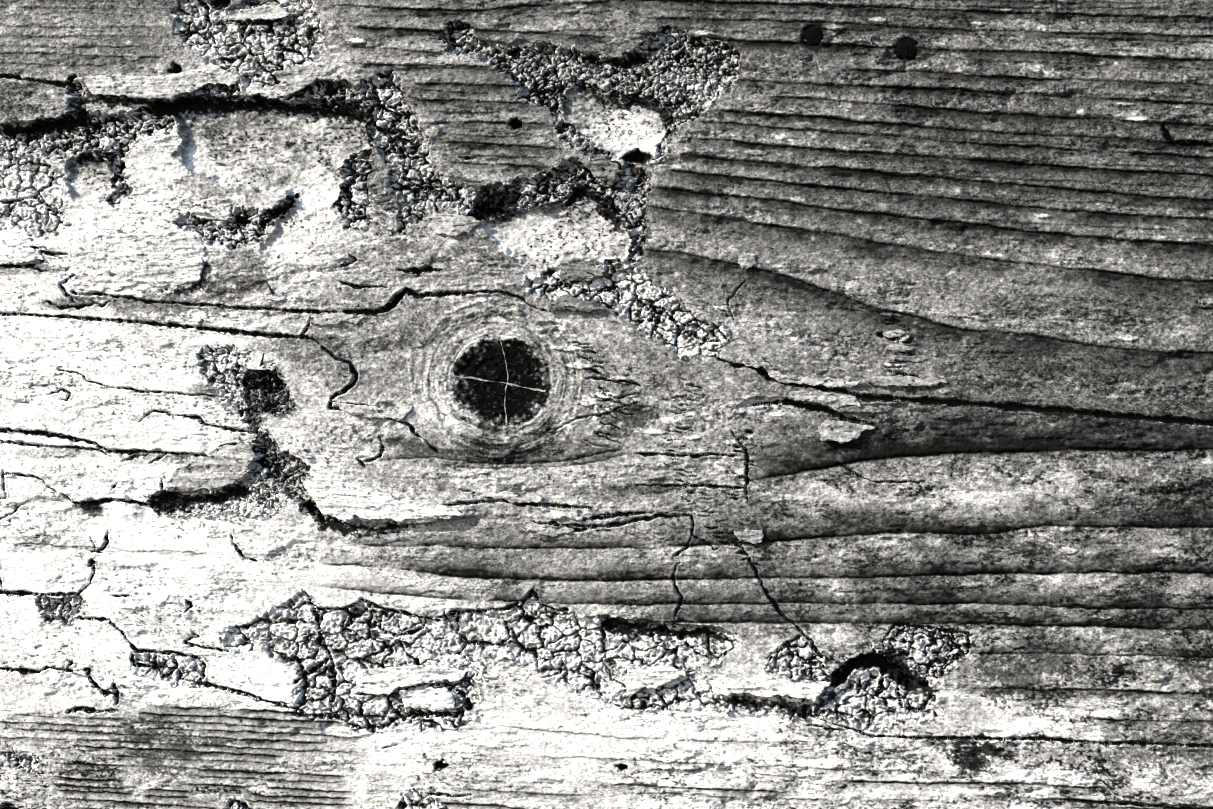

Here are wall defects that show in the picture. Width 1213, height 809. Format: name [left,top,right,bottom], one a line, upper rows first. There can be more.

spalling [0,0,741,360]
crack [0,246,548,467]
spalling [141,344,465,525]
crack [444,319,1213,659]
spalling [218,589,973,734]
crack [0,801,19,809]
crack [228,800,251,809]